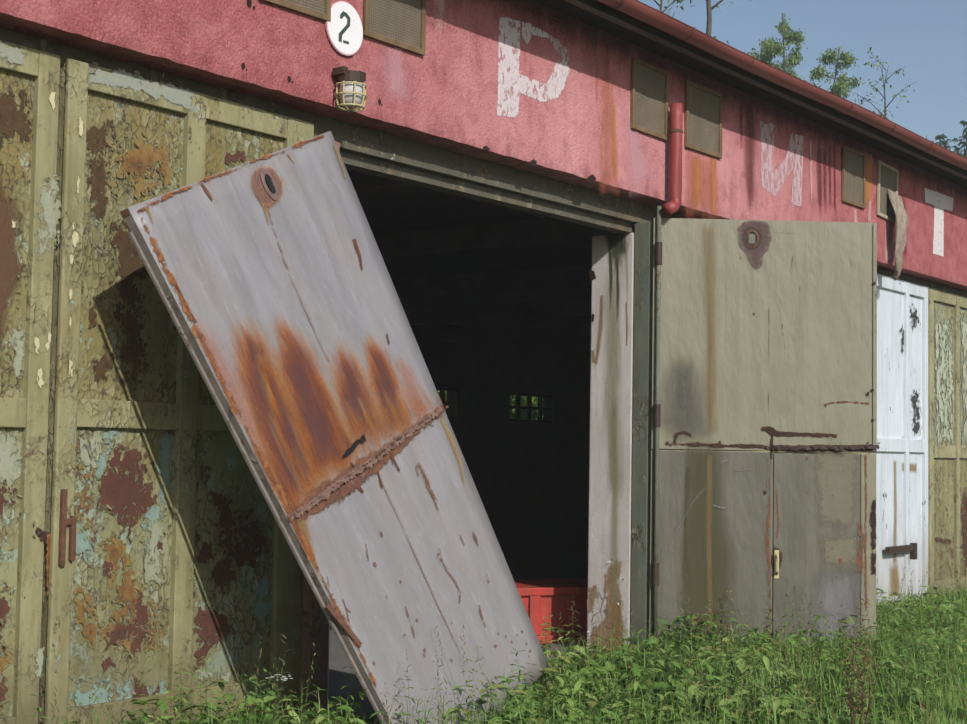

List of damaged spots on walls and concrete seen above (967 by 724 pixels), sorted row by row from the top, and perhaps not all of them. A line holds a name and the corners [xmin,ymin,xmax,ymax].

peeling [88,62,202,118]
peeling [34,174,61,260]
peeling [77,115,181,393]
corrosion [739,220,772,269]
peeling [0,428,23,519]
peeling [68,428,176,707]
peeling [193,490,267,684]
corrosion [137,135,465,686]
corrosion [665,426,880,641]
peeling [900,303,921,352]
peeling [911,389,922,434]
peeling [934,313,967,446]